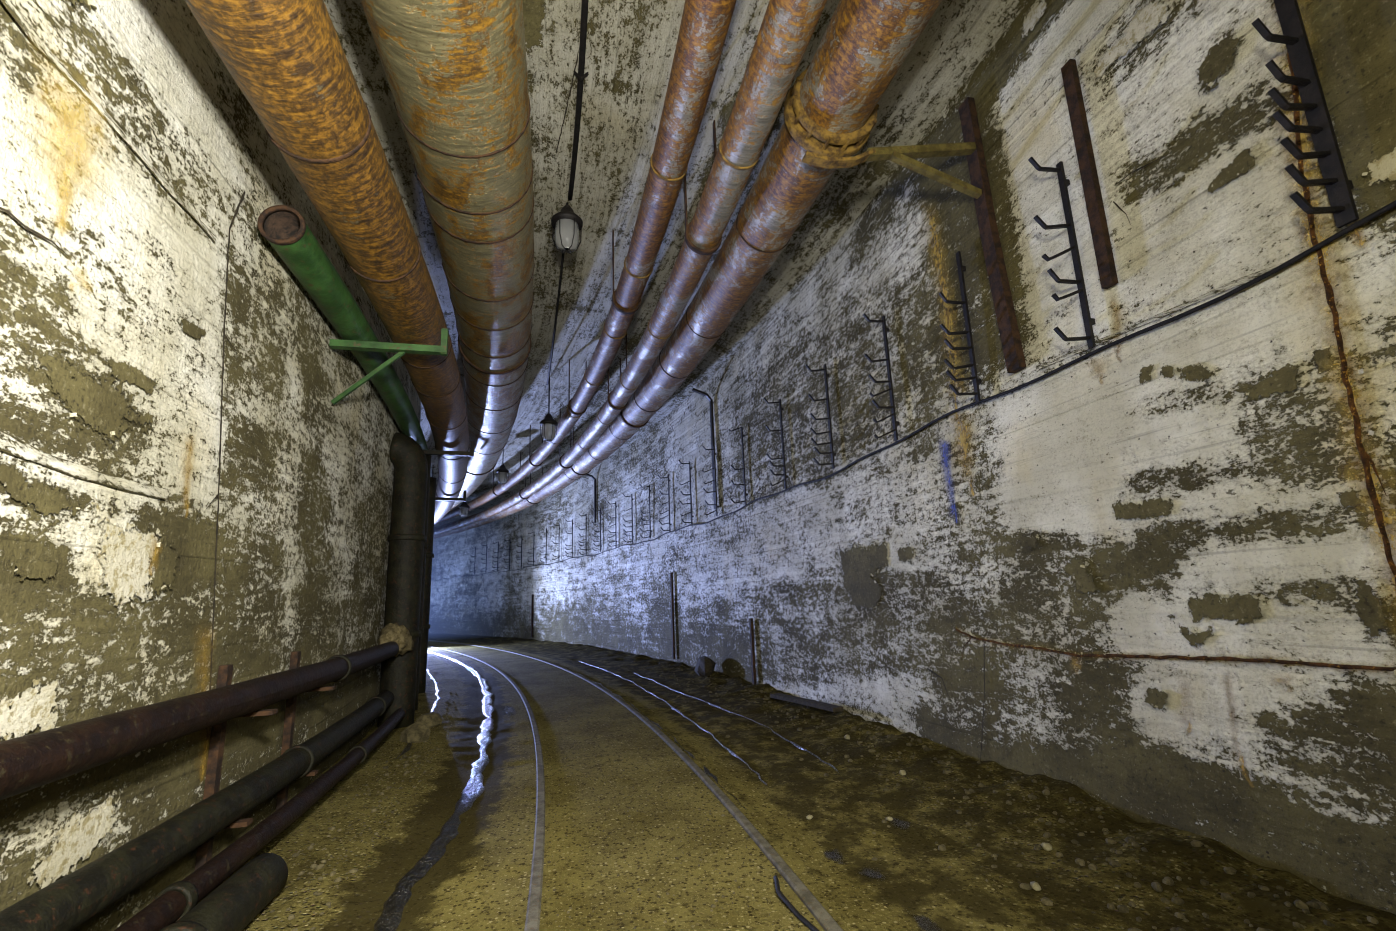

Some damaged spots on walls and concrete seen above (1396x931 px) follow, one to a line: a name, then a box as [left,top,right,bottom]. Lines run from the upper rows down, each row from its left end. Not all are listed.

peeling [1194,26,1245,96]
peeling [1208,148,1255,193]
peeling [181,318,206,342]
peeling [28,348,158,448]
peeling [1139,362,1216,384]
peeling [1246,346,1335,401]
peeling [0,459,80,518]
peeling [1112,497,1174,520]
peeling [148,540,181,599]
peeling [836,538,914,613]
peeling [1168,592,1263,648]
peeling [1144,687,1169,712]